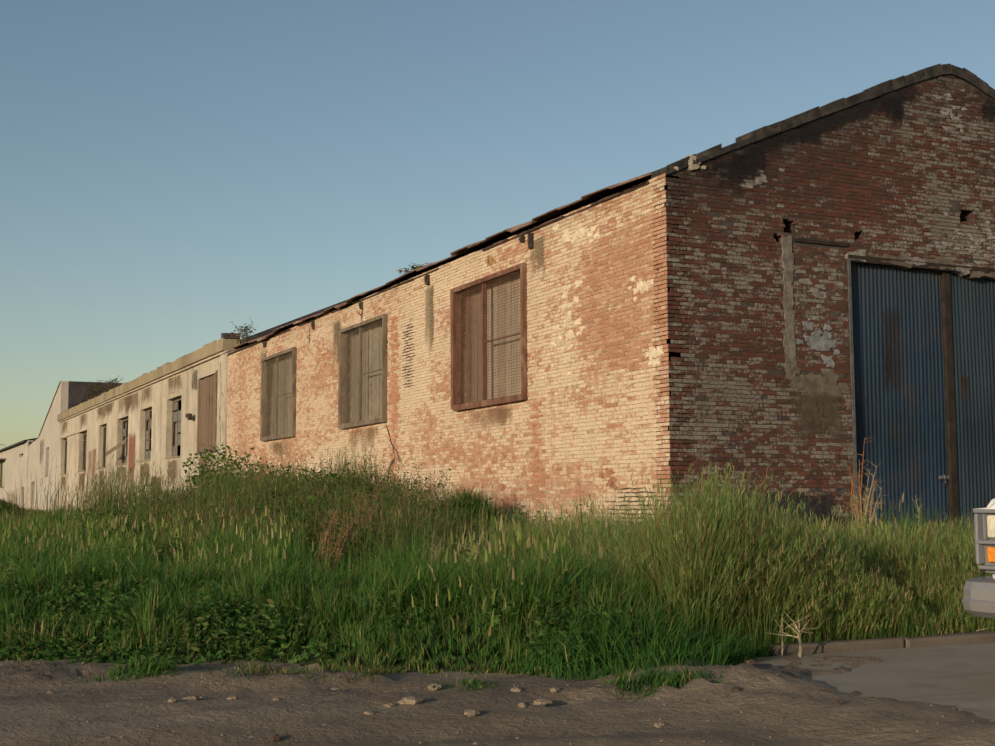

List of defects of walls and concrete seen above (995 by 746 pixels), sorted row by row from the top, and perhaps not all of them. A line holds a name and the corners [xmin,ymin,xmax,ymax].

damp [713,87,915,188]
damp [933,89,995,141]
peeling [553,223,601,253]
peeling [628,275,654,302]
peeling [550,280,584,376]
peeling [796,269,844,368]
peeling [645,346,664,366]
damp [735,493,845,536]